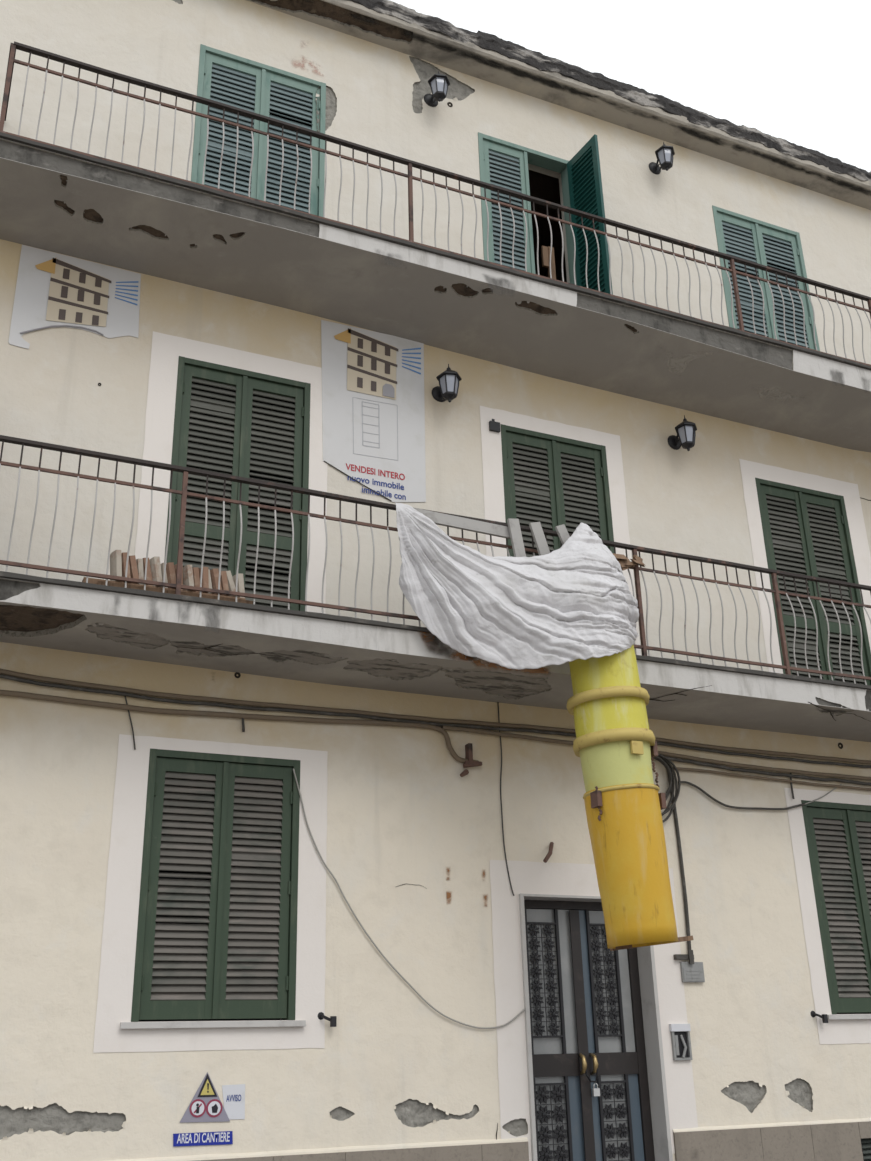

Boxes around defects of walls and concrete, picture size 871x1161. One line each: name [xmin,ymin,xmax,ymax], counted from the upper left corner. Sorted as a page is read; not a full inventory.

spalling [250,0,475,113]
flaking render [0,138,320,245]
spalling [434,283,494,298]
spalling [515,301,558,316]
flaking render [0,578,552,700]
flaking render [815,690,871,716]
flaking render [0,1103,128,1140]
flaking render [330,1106,355,1121]
flaking render [393,1099,479,1127]
flaking render [502,1118,528,1137]
flaking render [721,1081,767,1113]
flaking render [785,1078,814,1112]